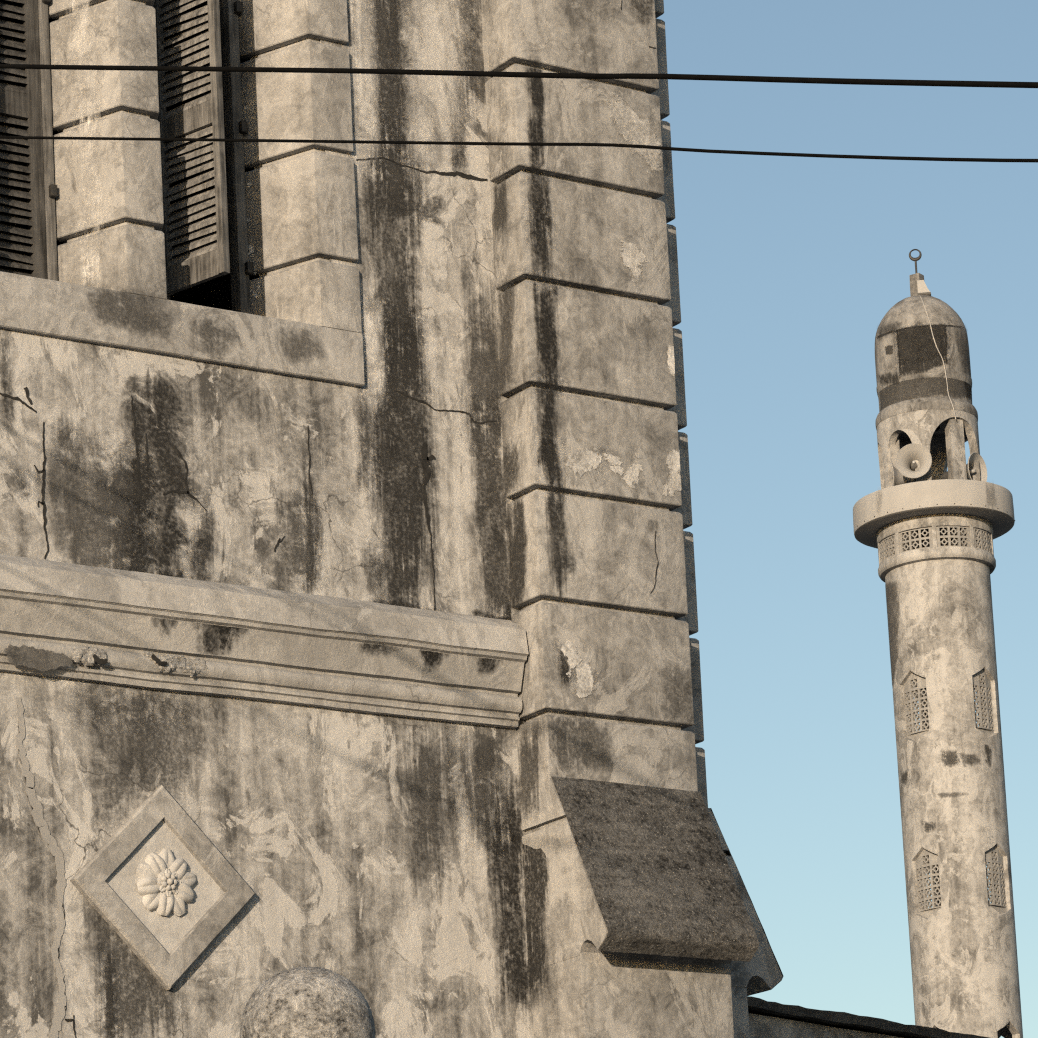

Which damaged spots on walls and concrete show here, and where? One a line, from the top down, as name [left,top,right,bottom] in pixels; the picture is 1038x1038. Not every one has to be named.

crack [356,157,488,181]
water stain [350,0,485,610]
water stain [527,65,574,597]
water stain [48,375,213,580]
water stain [275,468,322,591]
water stain [468,286,526,620]
peeling [566,445,643,488]
peeling [661,450,682,497]
spalling [144,651,208,677]
water stain [203,623,247,654]
peeling [560,640,594,698]
crack [16,697,76,1038]